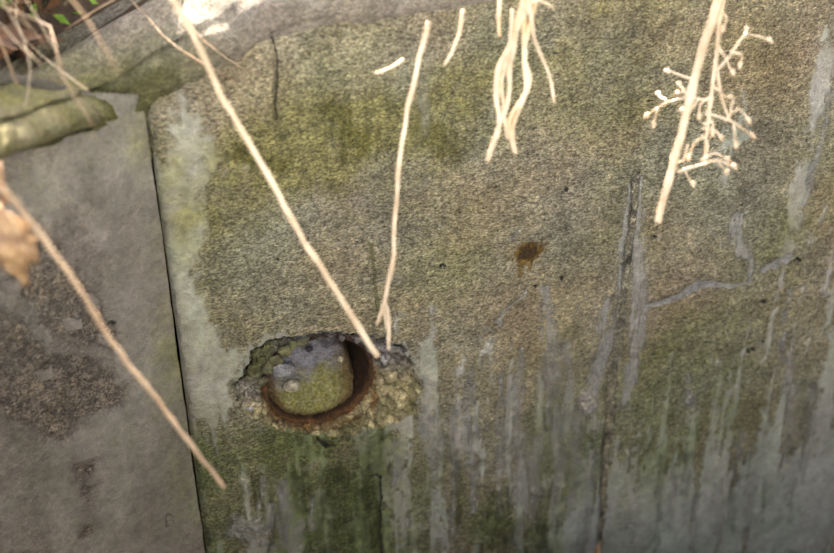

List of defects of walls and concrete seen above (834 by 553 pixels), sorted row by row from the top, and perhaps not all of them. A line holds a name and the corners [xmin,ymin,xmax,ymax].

corrosion [512,241,547,278]
leakage [584,176,648,415]
corrosion [261,333,377,431]
spalling [230,331,422,437]